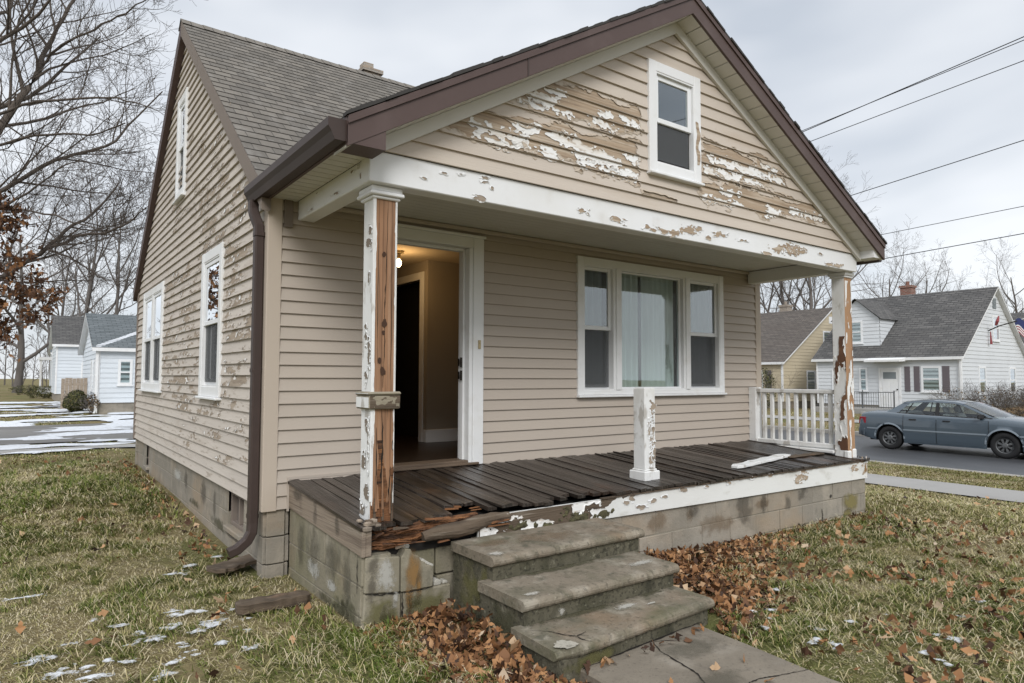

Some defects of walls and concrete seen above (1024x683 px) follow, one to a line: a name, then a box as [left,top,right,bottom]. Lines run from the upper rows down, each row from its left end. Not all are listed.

peeling [438,82,678,203]
peeling [696,122,829,225]
peeling [365,224,377,252]
peeling [161,131,253,465]
peeling [364,322,375,389]
peeling [833,281,854,451]
peeling [359,409,375,516]
peeling [647,400,657,468]
peeling [794,470,809,484]
peeling [479,488,688,537]
leakage [379,562,419,622]